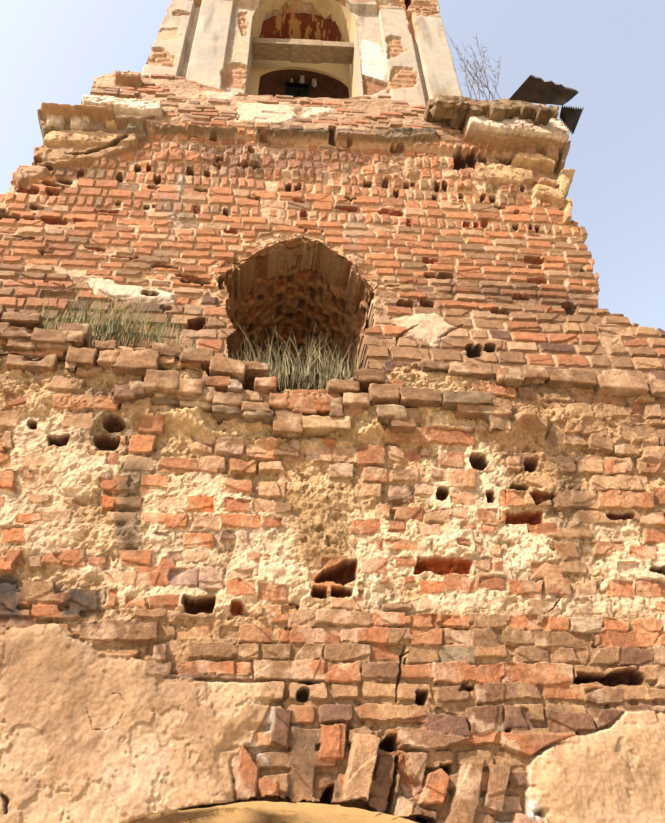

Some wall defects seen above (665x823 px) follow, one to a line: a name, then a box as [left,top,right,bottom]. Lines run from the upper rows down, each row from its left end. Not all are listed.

spalling [259,2,343,42]
spalling [360,0,419,96]
spalling [505,482,560,525]
leakage [0,576,22,617]
leakage [65,589,94,618]
spalling [181,593,217,615]
spalling [310,557,359,599]
spalling [414,555,476,575]
crack [395,644,410,703]
spalling [573,667,648,687]
flaking render [0,619,276,823]
flaking render [523,708,665,823]